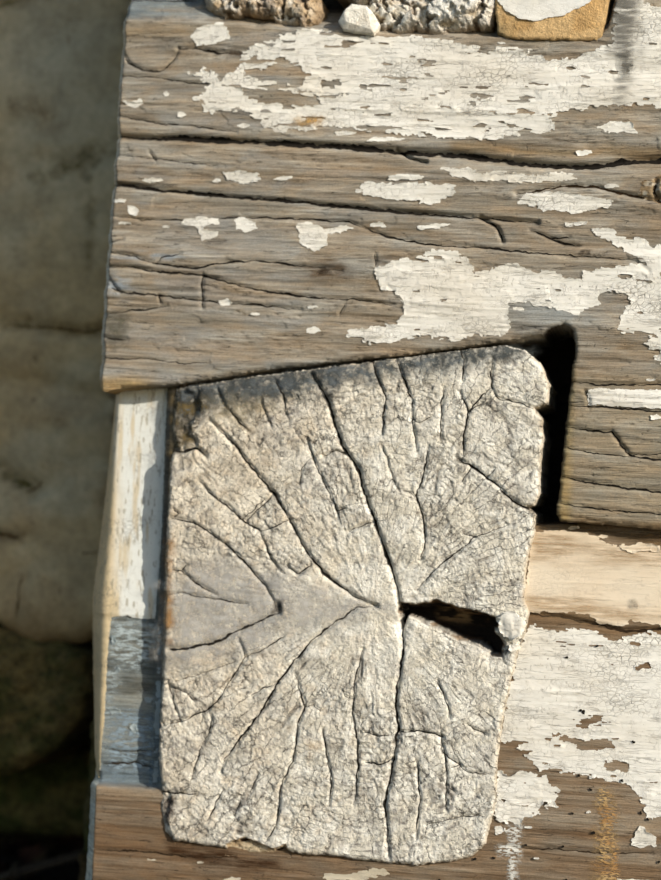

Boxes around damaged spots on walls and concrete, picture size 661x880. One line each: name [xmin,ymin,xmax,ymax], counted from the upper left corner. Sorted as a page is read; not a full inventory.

spalling [338,4,381,36]
peeling [498,0,591,21]